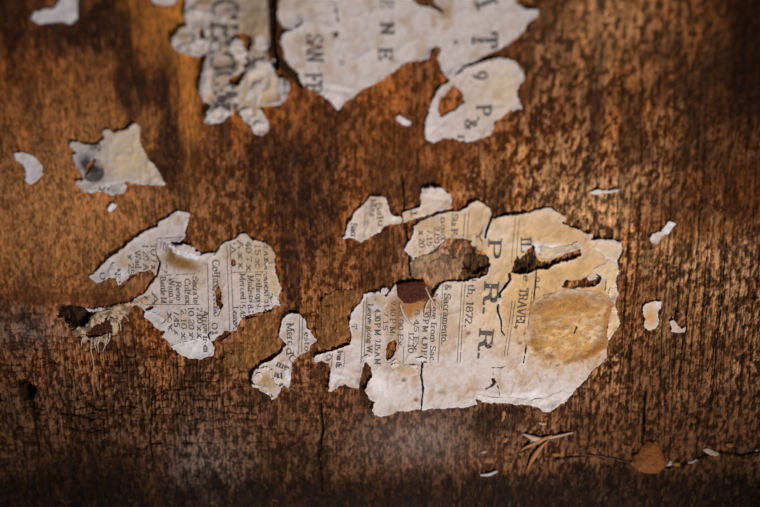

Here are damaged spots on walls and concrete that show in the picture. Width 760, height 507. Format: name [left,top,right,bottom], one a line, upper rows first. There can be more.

peeling [171,38,218,57]
peeling [204,34,275,124]
peeling [14,152,43,184]
peeling [76,180,97,193]
peeling [425,186,449,201]
peeling [172,244,201,259]
water stain [532,297,613,362]
peeling [252,367,286,395]
crack [418,363,426,412]
crack [639,391,647,442]
crack [555,453,630,465]
crack [664,450,760,469]